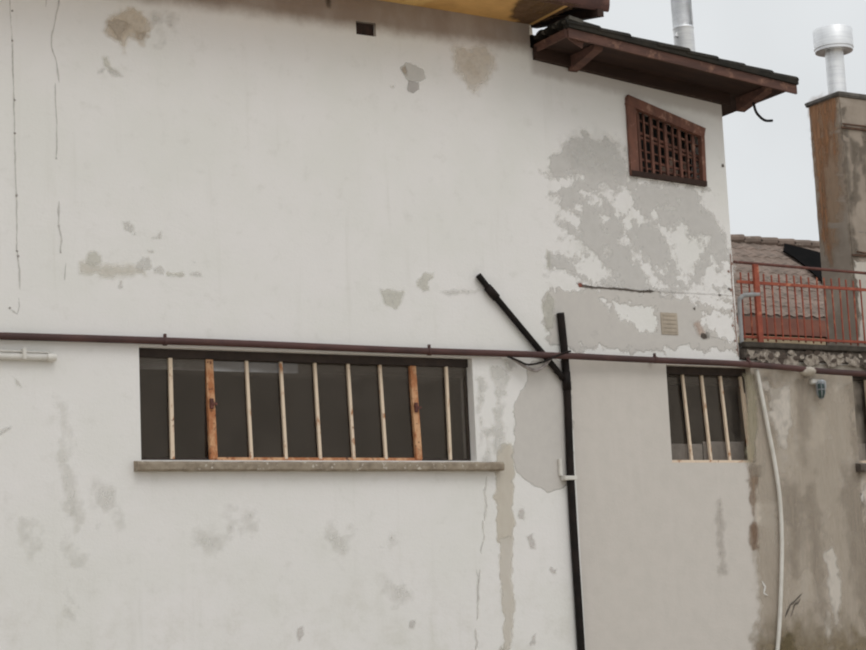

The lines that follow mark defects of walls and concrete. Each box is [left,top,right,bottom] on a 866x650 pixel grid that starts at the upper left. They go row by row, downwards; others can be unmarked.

leakage [106,9,149,45]
spalling [401,63,425,93]
flaking render [542,131,866,376]
corrosion [809,98,843,258]
flaking render [512,359,574,493]
leakage [493,444,515,650]
leakage [745,375,866,650]